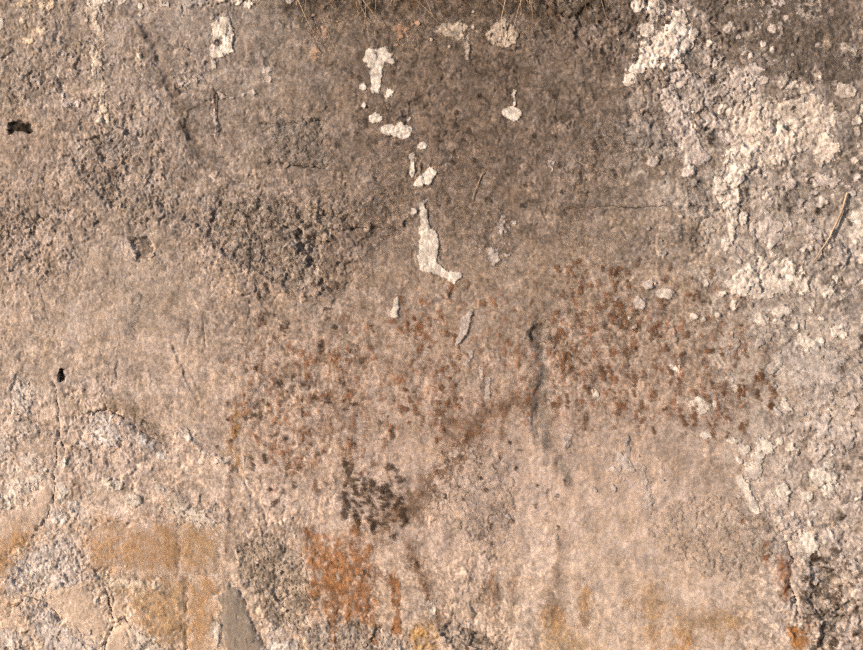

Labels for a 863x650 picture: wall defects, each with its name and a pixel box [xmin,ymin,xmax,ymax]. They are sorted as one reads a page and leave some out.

damp [698,0,860,113]
crack [8,372,65,537]
damp [0,372,170,650]
rust [228,335,405,496]
damp [336,457,408,541]
rust [377,298,628,533]
damp [531,258,669,485]
rust [654,343,749,420]
damp [678,345,777,440]
damp [735,475,759,514]
rust [304,524,379,645]
rust [388,573,440,650]